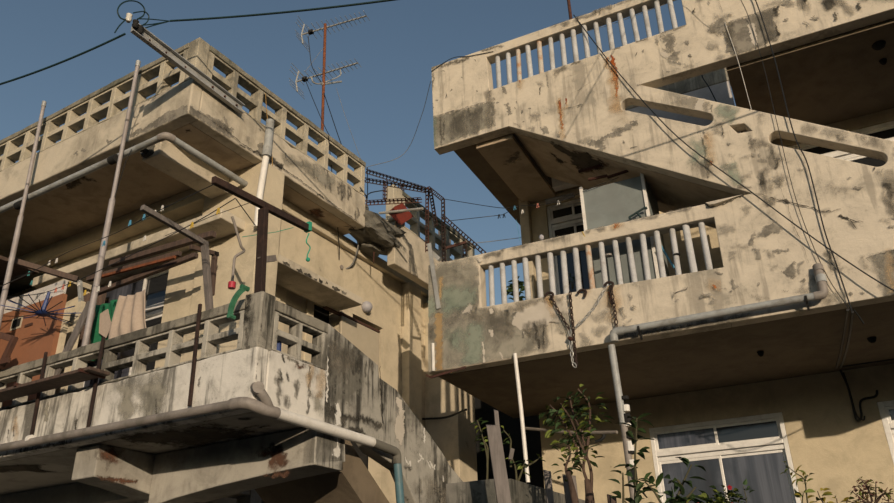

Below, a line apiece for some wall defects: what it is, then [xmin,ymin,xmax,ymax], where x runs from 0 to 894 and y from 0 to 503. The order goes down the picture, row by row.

damp [822,0,861,20]
corrosion [606,55,618,97]
peeling [432,68,638,174]
damp [428,257,572,371]
damp [274,354,382,434]